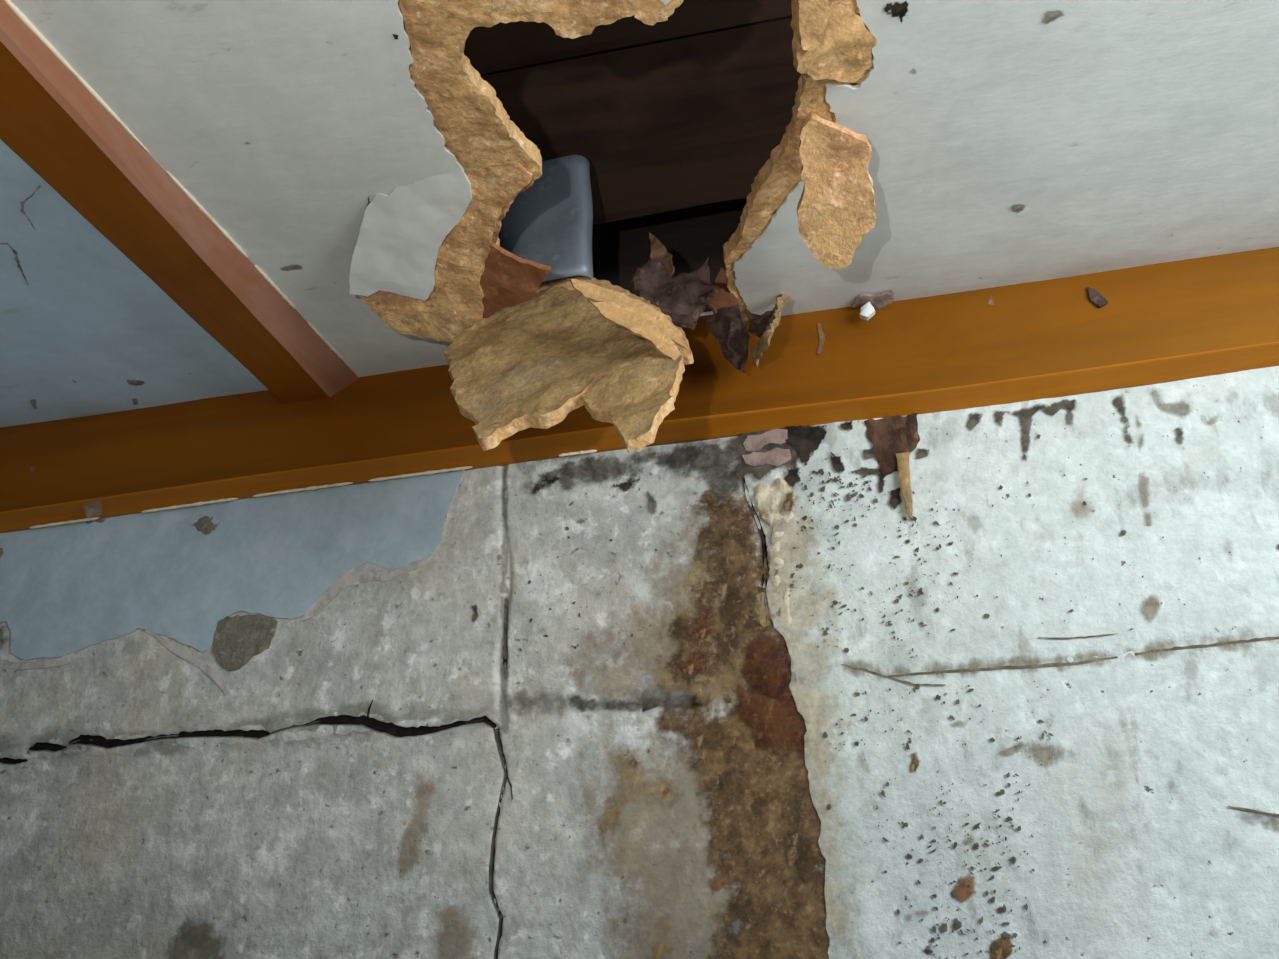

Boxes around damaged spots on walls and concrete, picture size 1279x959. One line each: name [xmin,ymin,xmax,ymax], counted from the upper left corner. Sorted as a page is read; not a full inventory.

flaking render [851,289,894,310]
damp [967,399,1076,460]
damp [1111,395,1143,447]
damp [1152,391,1191,444]
damp [1140,476,1151,525]
peeling [0,470,464,696]
crack [0,464,513,959]
rust [518,486,830,959]
damp [525,421,960,937]
damp [935,685,994,723]
peeling [742,366,1279,959]